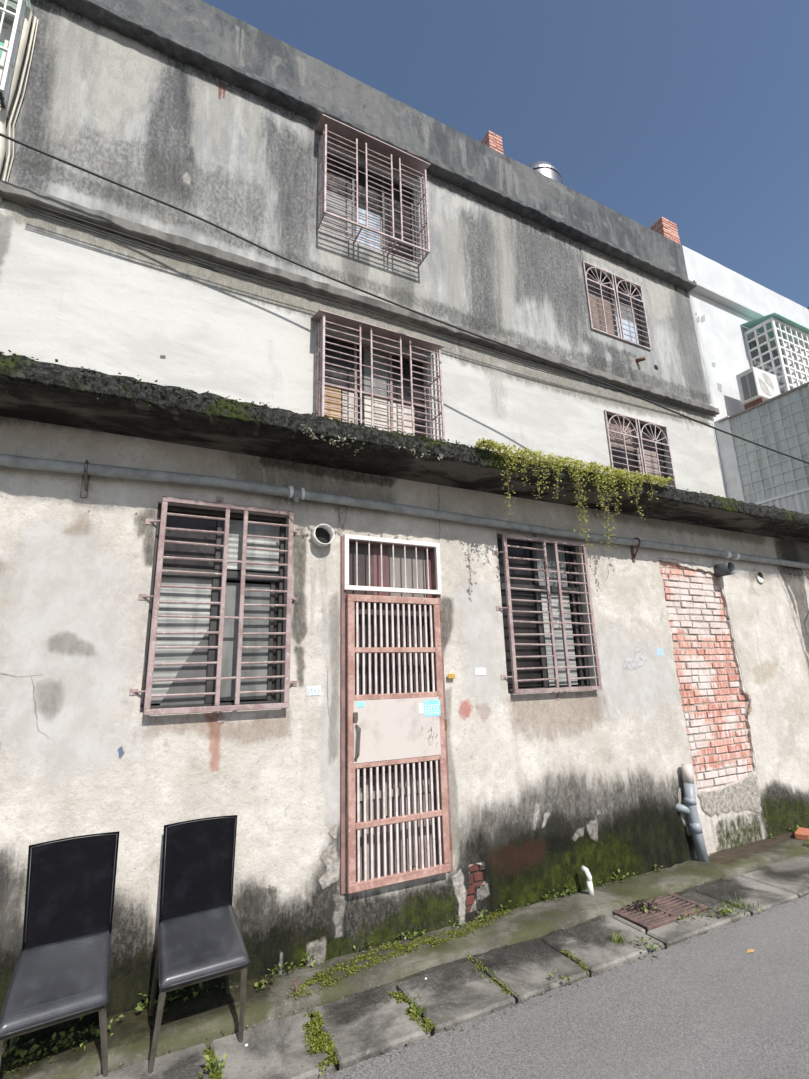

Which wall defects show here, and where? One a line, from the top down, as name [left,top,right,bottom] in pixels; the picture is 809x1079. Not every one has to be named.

water stain [14,0,703,397]
water stain [292,529,340,857]
water stain [441,584,501,698]
water stain [595,630,678,716]
water stain [760,782,809,839]
water stain [0,860,23,964]
water stain [110,904,157,966]
water stain [233,775,693,958]
flaking render [466,863,486,910]